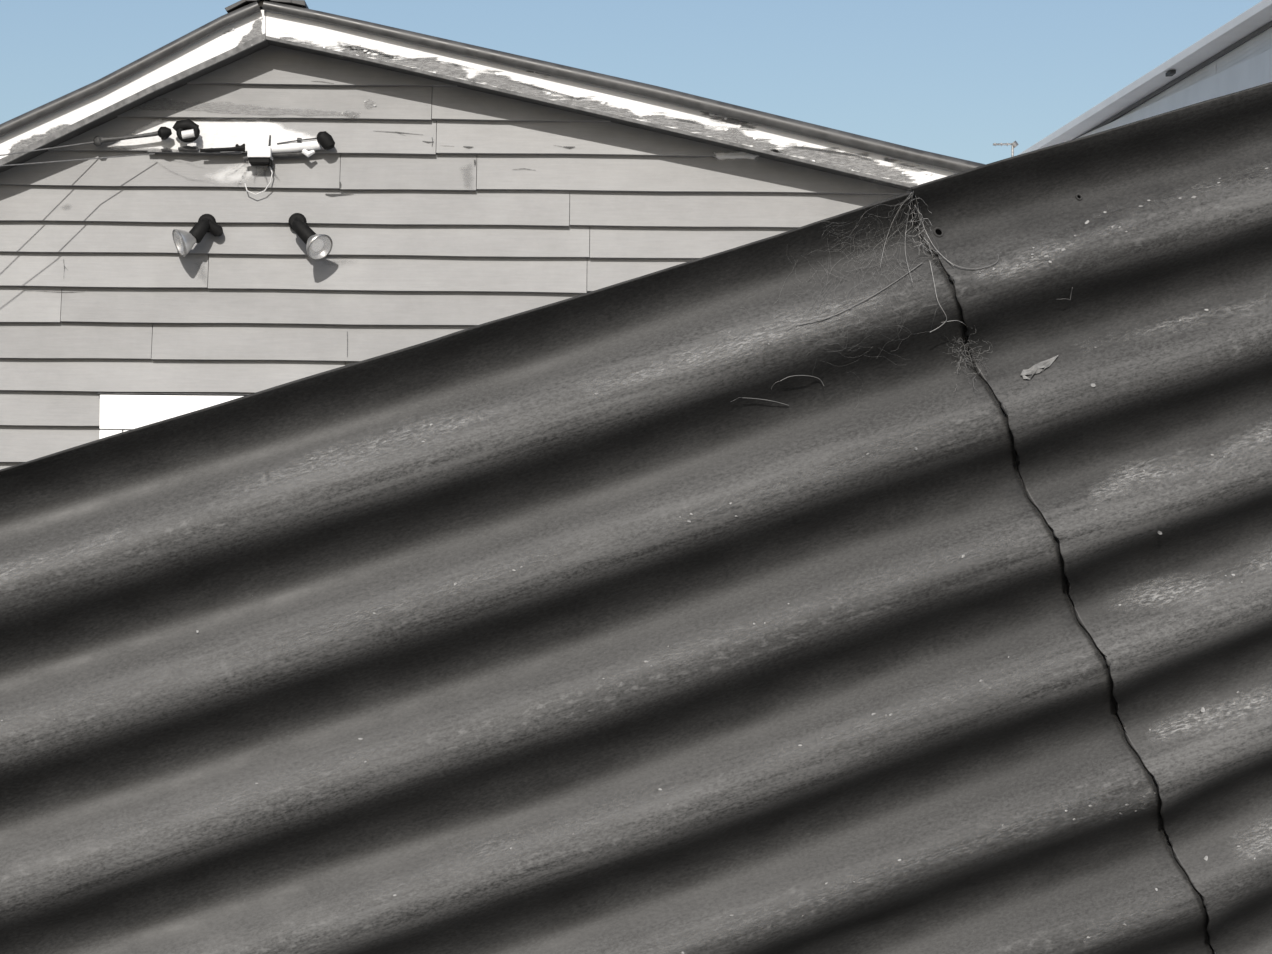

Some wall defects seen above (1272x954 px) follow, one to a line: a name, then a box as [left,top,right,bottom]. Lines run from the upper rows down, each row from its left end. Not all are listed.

peeling [227,17,933,186]